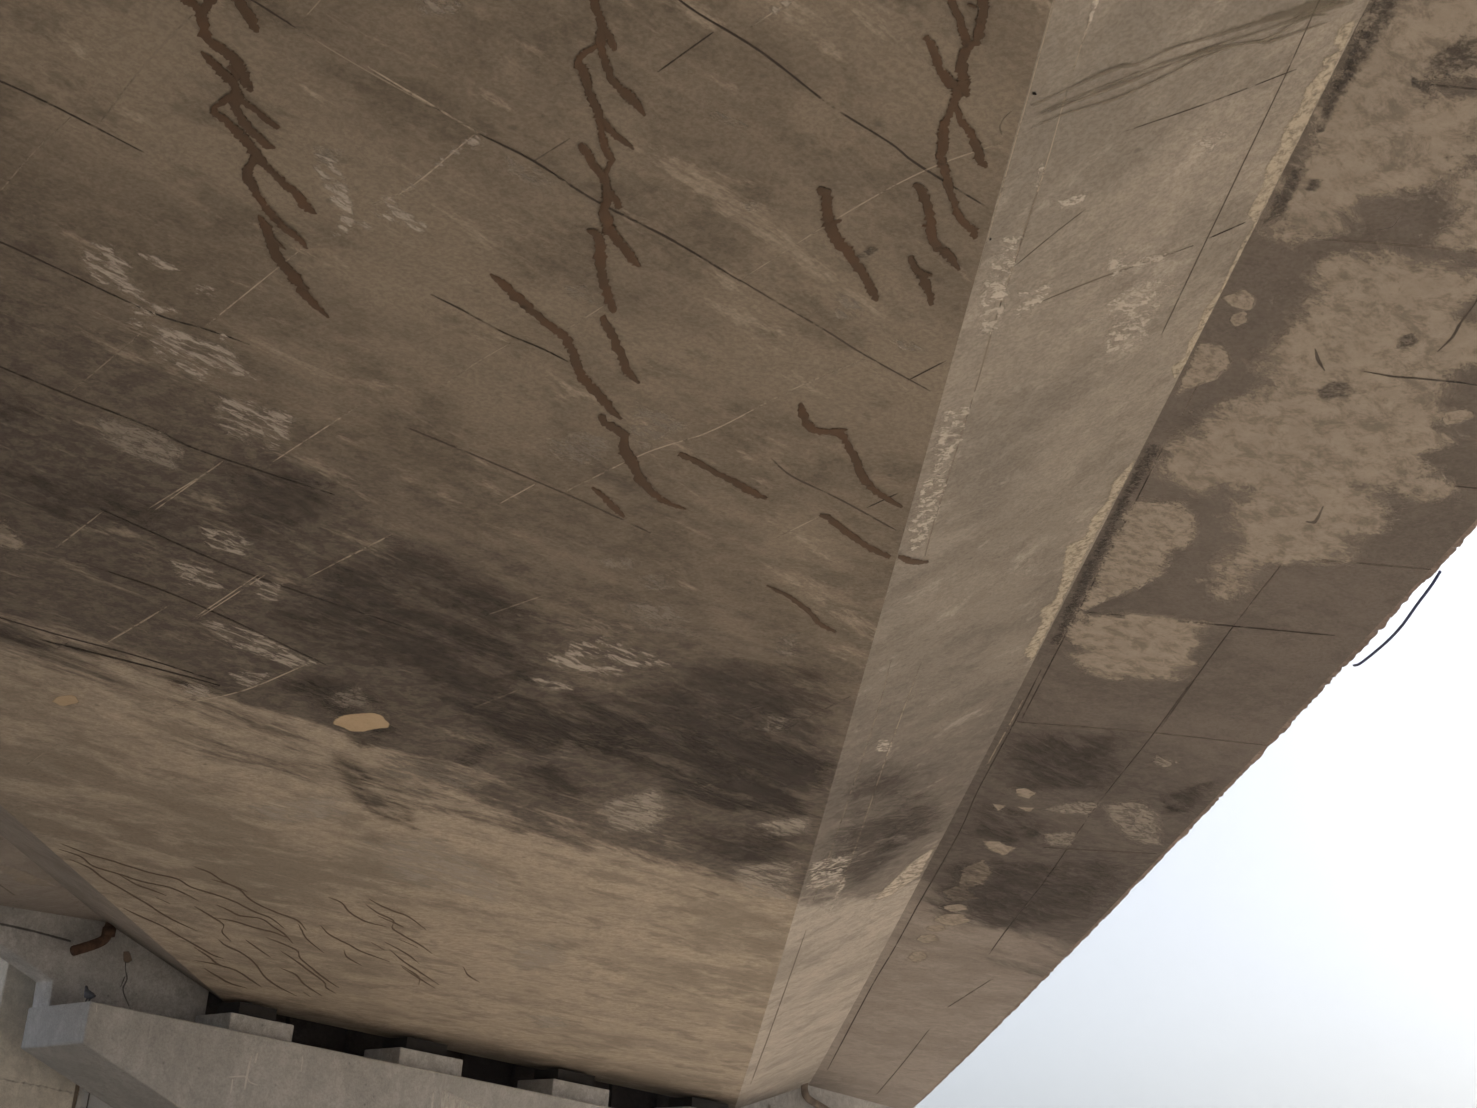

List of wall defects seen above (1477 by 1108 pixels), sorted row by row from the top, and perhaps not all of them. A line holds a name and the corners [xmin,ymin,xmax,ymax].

crack [180,0,330,318]
crack [908,0,990,306]
crack [489,0,686,518]
crack [816,187,879,302]
crack [797,403,903,508]
efflorescence [170,560,224,590]
efflorescence [199,526,254,557]
leakage [201,620,369,716]
spalling [333,713,389,732]
leakage [254,551,851,912]
crack [59,843,480,997]
leakage [875,846,935,901]